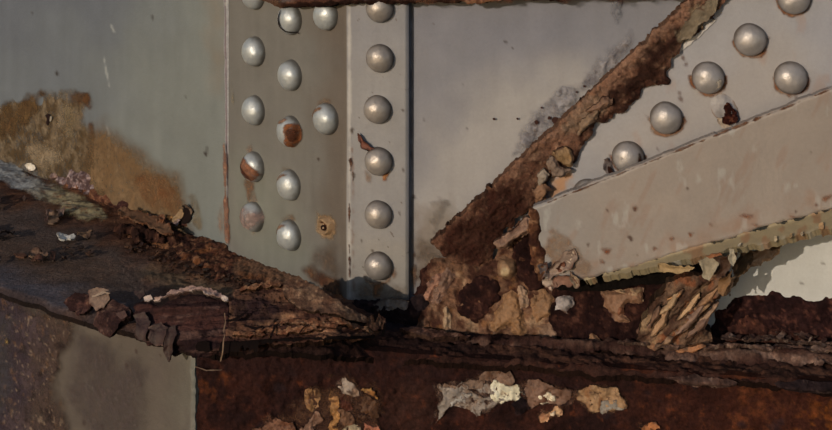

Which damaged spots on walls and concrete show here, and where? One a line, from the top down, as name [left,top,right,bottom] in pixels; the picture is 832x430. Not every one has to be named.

rust [689,75,727,97]
rust [0,91,832,367]
peeling [657,236,782,296]
rust [0,298,71,430]
peeling [252,377,380,430]
rust [273,374,382,430]
rust [511,396,530,416]
peeling [435,371,628,424]
rust [666,374,739,388]